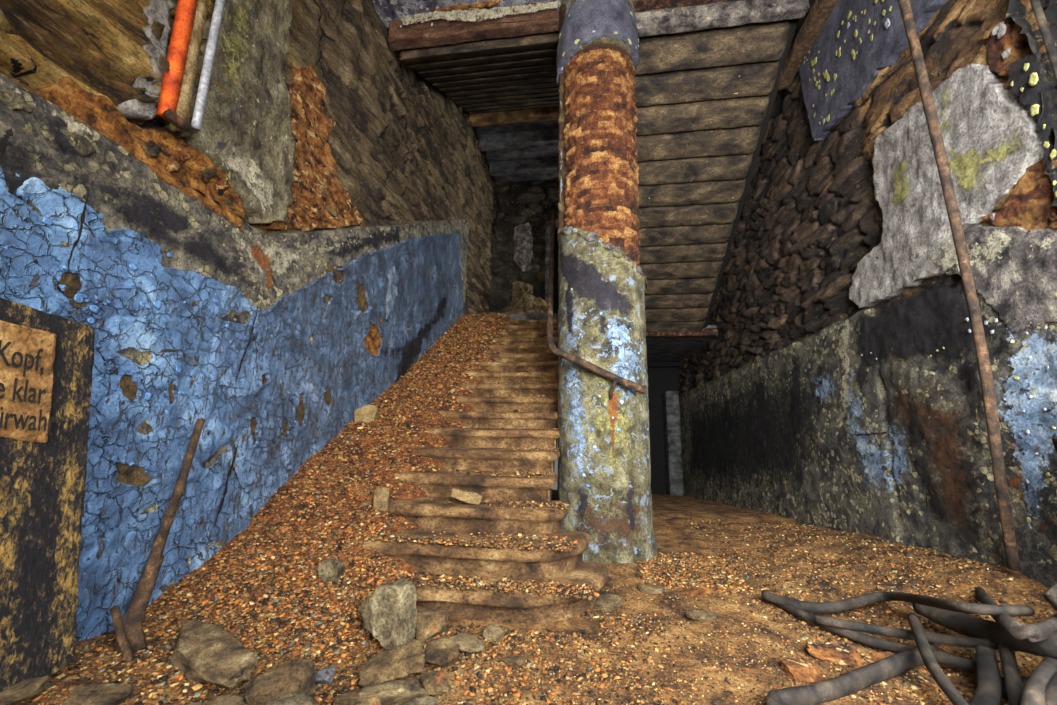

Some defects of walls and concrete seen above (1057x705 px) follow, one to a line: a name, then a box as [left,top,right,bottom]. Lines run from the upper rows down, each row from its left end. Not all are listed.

peeling [151,20,165,40]
peeling [159,55,170,73]
crack [0,128,13,155]
spalling [35,76,246,229]
spalling [264,65,366,231]
spalling [979,21,1057,230]
crack [64,192,94,278]
peeling [0,152,464,641]
rust [608,393,618,453]